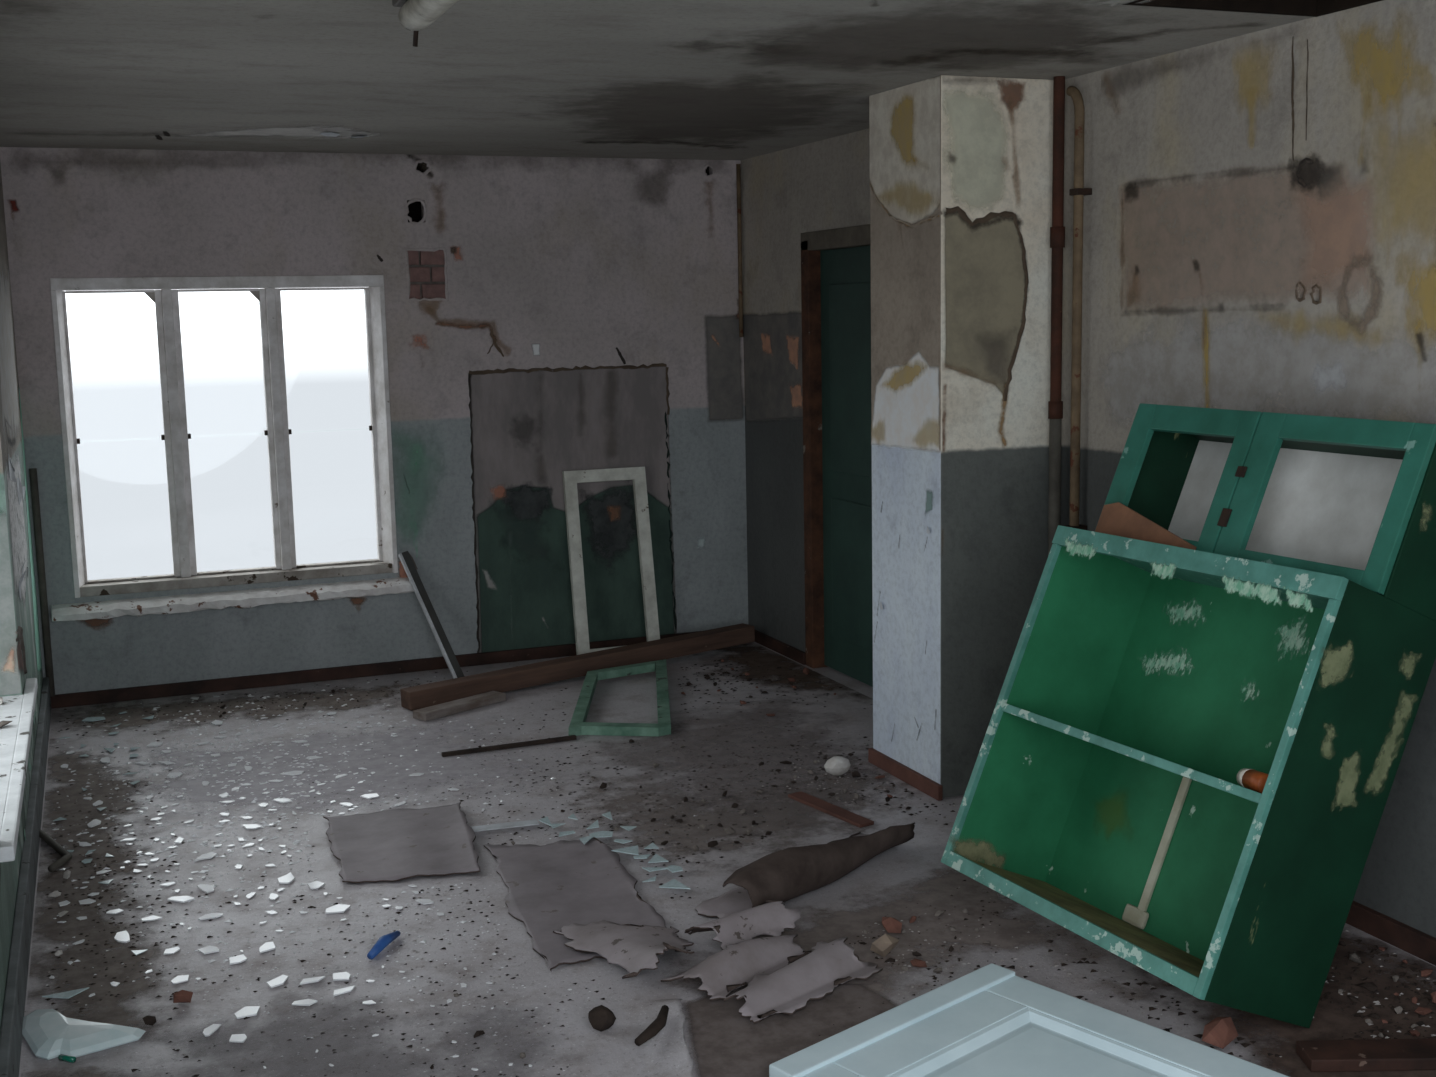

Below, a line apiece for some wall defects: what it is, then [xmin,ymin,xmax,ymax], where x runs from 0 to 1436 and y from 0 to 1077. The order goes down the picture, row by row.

damp [757,6,1136,68]
damp [576,84,833,148]
spalling [407,201,422,222]
spalling [405,247,449,310]
spalling [869,76,1029,451]
damp [1338,257,1381,334]
peeling [0,281,42,852]